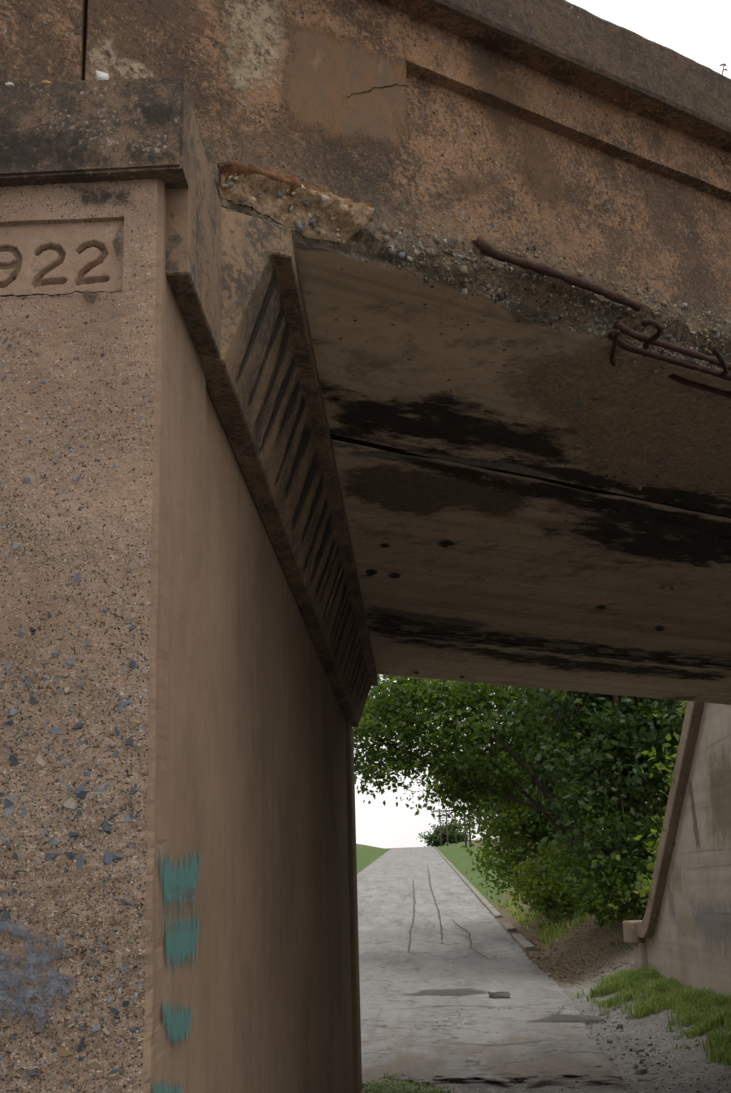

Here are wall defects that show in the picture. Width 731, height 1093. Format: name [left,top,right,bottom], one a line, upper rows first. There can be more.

spalling [219,168,731,494]
damp [238,271,731,713]